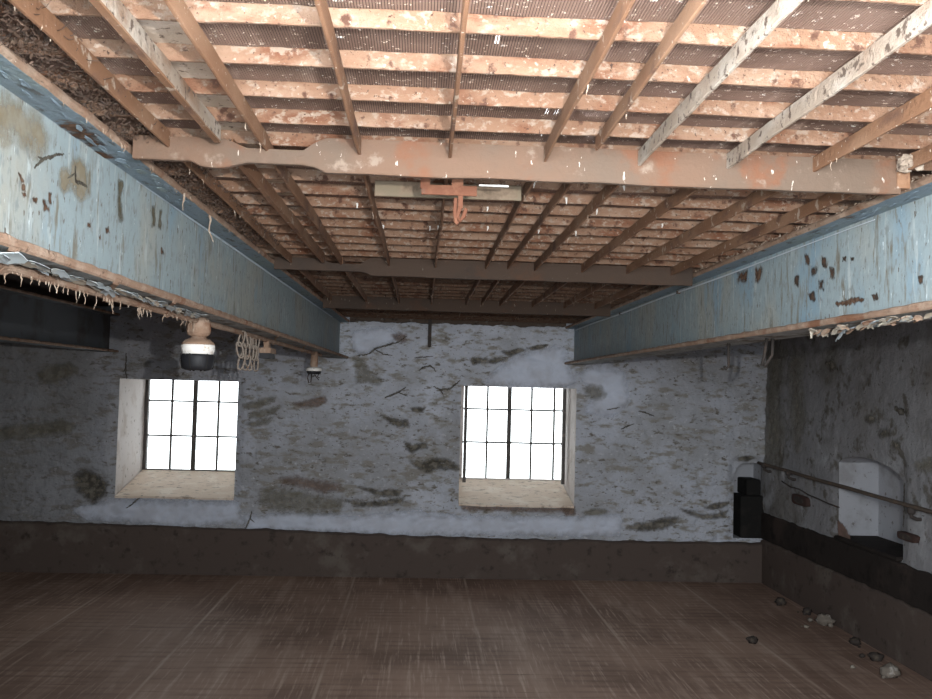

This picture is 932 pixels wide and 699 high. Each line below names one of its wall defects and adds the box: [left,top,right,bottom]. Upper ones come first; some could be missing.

rust [0,98,46,155]
rust [18,172,52,212]
rust [60,159,88,200]
rust [152,206,162,229]
peeling [0,252,208,318]
rust [738,267,762,283]
rust [804,254,854,302]
rust [835,293,878,307]
peeling [809,313,932,342]
water stain [261,489,341,513]